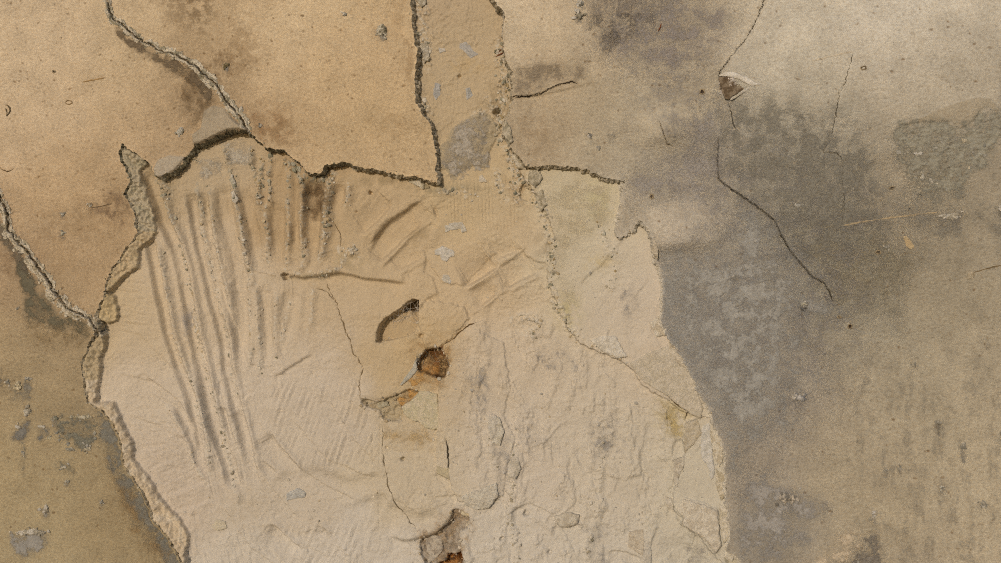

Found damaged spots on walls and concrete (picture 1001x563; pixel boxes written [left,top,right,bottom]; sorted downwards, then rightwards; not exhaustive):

crack [102,0,252,133]
crack [718,1,764,76]
crack [823,55,853,218]
crack [0,169,109,337]
spalling [80,0,741,563]
crack [716,139,833,302]
corrosion [398,346,451,406]
corrosion [420,510,467,563]